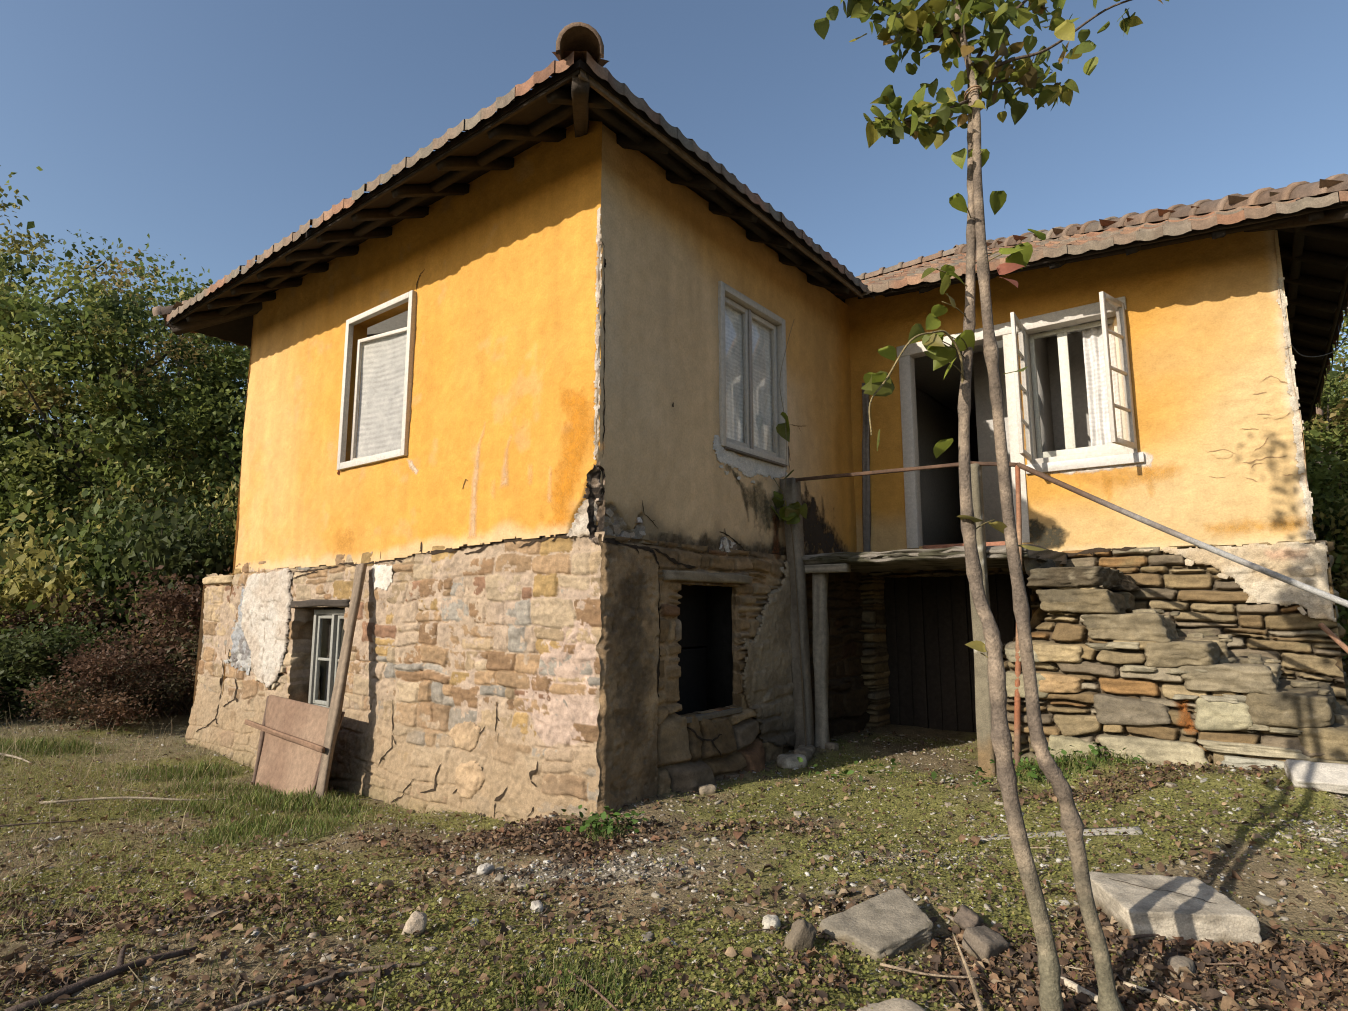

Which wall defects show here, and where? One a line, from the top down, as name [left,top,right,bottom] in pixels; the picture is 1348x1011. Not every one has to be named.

flaking render [567,208,646,545]
peeling [713,435,788,484]
peeling [224,568,293,690]
peeling [372,564,393,590]
crack [292,501,695,697]
water stain [659,465,786,557]
flaking render [719,537,737,553]
water stain [801,483,847,555]
crack [196,652,280,732]
crack [378,700,396,766]
crack [391,763,457,803]
crack [494,761,538,817]